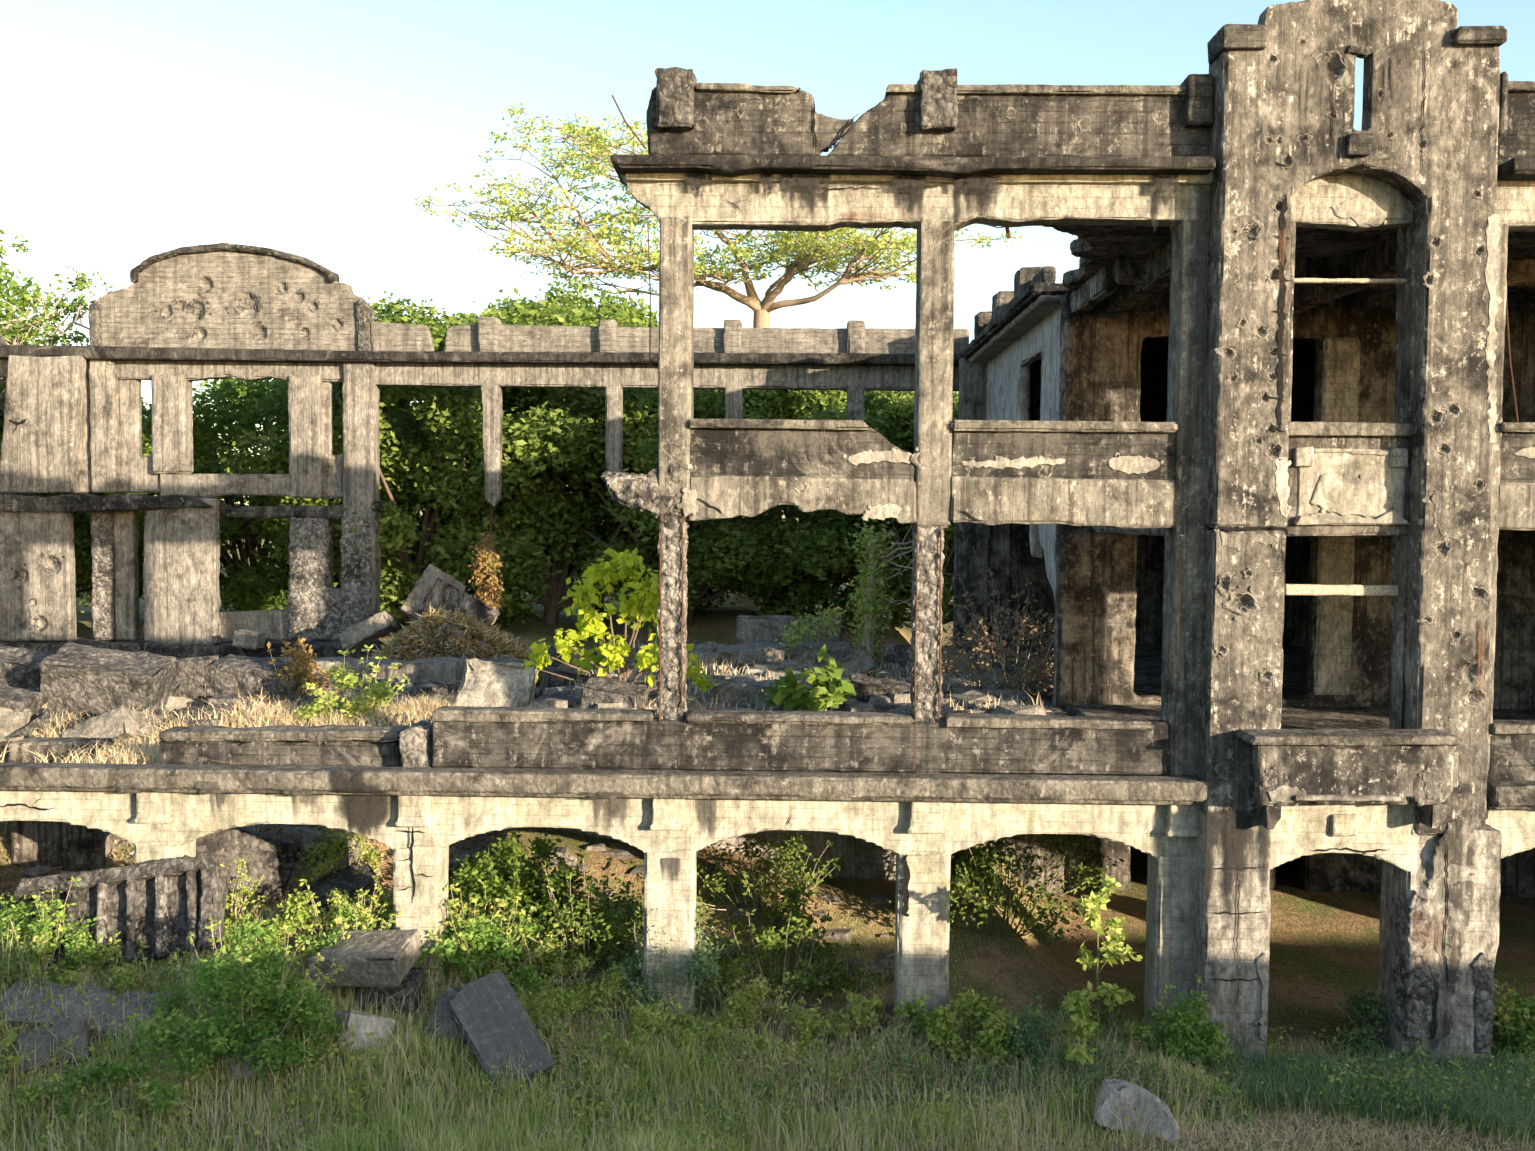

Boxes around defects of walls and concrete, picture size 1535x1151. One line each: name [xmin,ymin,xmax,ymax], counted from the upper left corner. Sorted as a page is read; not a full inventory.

crack [812,99,858,152]
crack [810,186,882,198]
spalling [1237,315,1292,519]
peeling [817,446,938,477]
peeling [960,451,1065,478]
peeling [1108,453,1164,474]
peeling [1310,471,1397,517]
peeling [1213,526,1280,621]
crack [0,798,56,811]
leakage [1205,807,1271,929]
peeling [1428,817,1480,1041]